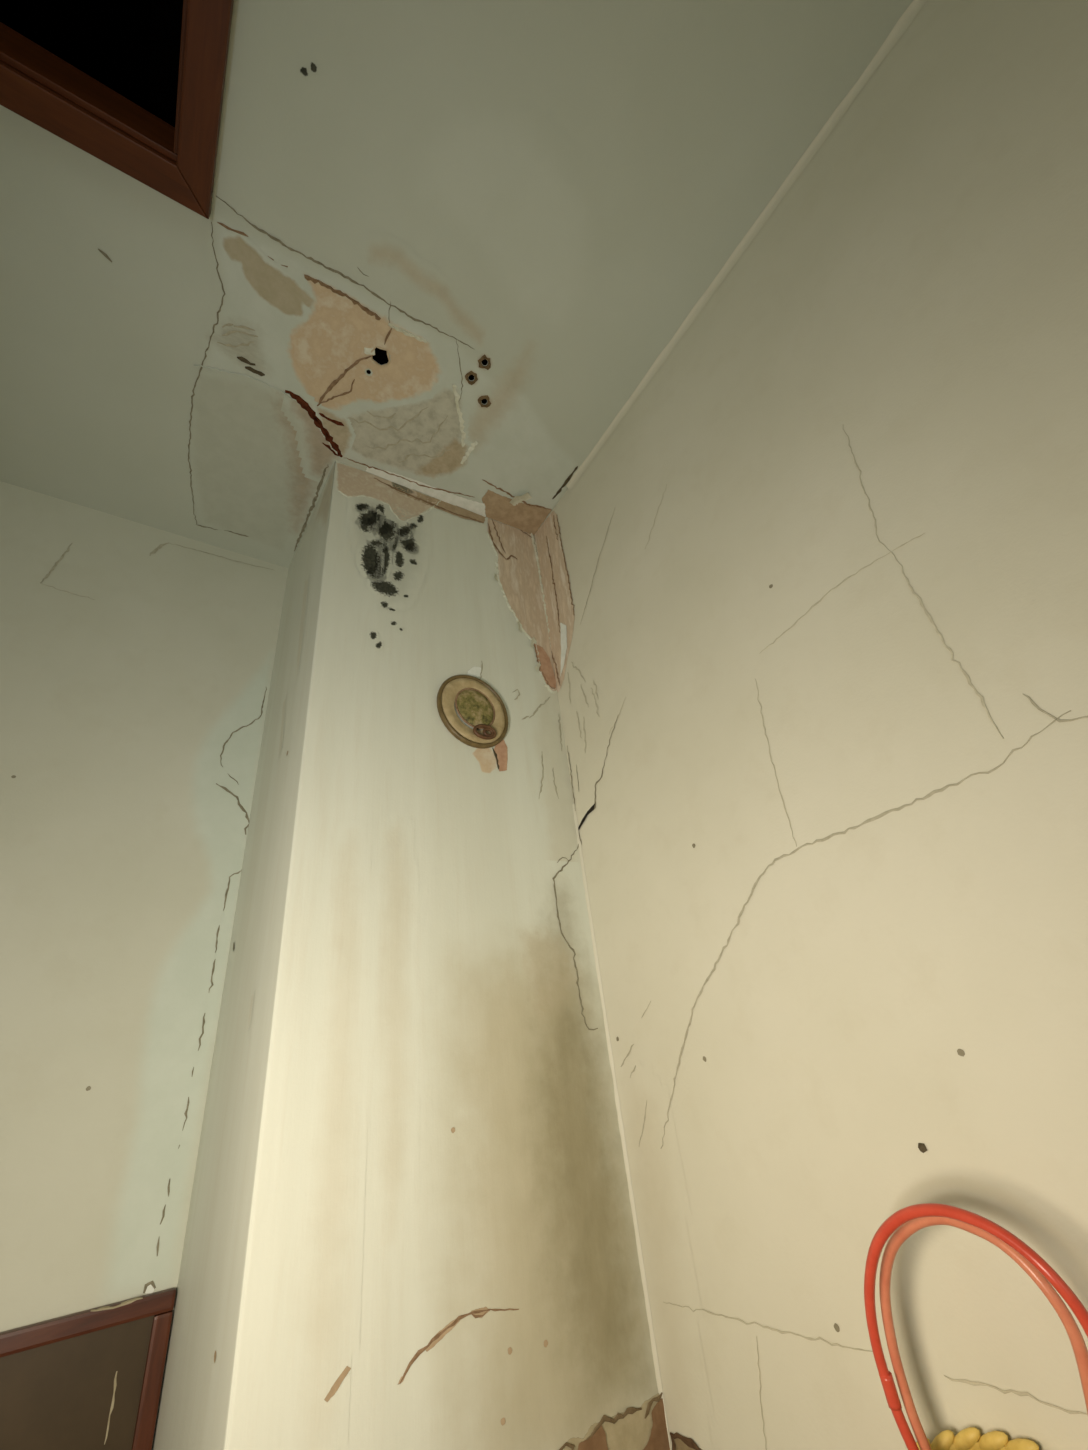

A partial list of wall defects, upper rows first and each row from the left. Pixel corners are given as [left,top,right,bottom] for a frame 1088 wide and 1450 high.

crack [150,196,578,570]
leakage [313,463,432,650]
peeling [217,222,575,694]
corrosion [461,352,495,411]
crack [216,688,267,835]
peeling [471,740,508,775]
crack [512,662,626,1030]
crack [661,429,1088,1148]
crack [157,870,242,1256]
leakage [278,674,715,1450]
crack [398,1307,519,1384]
flaking render [559,1392,702,1450]